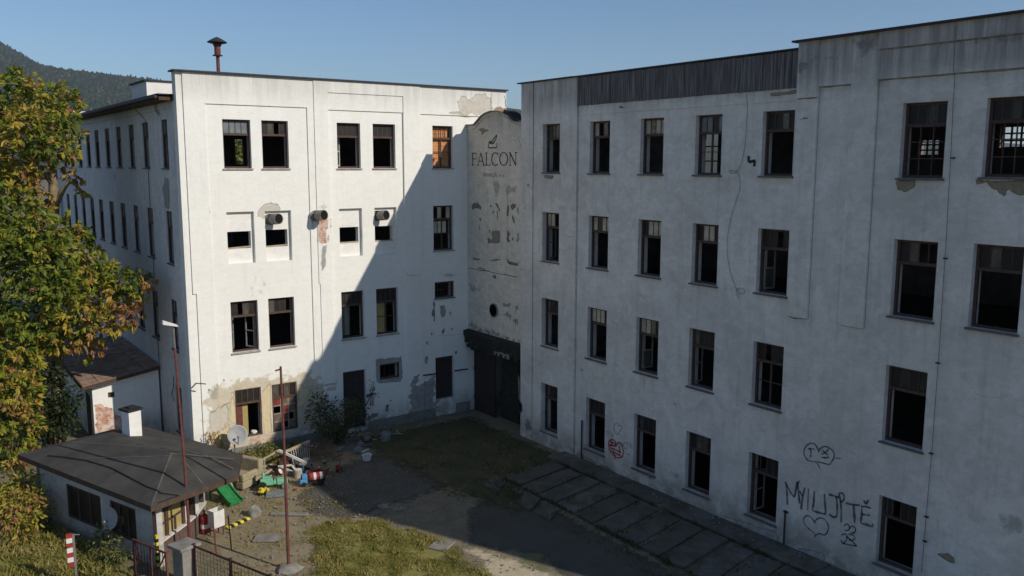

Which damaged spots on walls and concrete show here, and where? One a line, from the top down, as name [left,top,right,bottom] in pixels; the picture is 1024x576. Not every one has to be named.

flaking render [457,93,506,117]
flaking render [976,179,1024,196]
flaking render [258,203,280,218]
flaking render [318,220,328,244]
flaking render [472,203,519,243]
spalling [408,306,452,413]
flaking render [94,404,122,433]
flaking render [209,392,235,447]
flaking render [250,384,282,444]